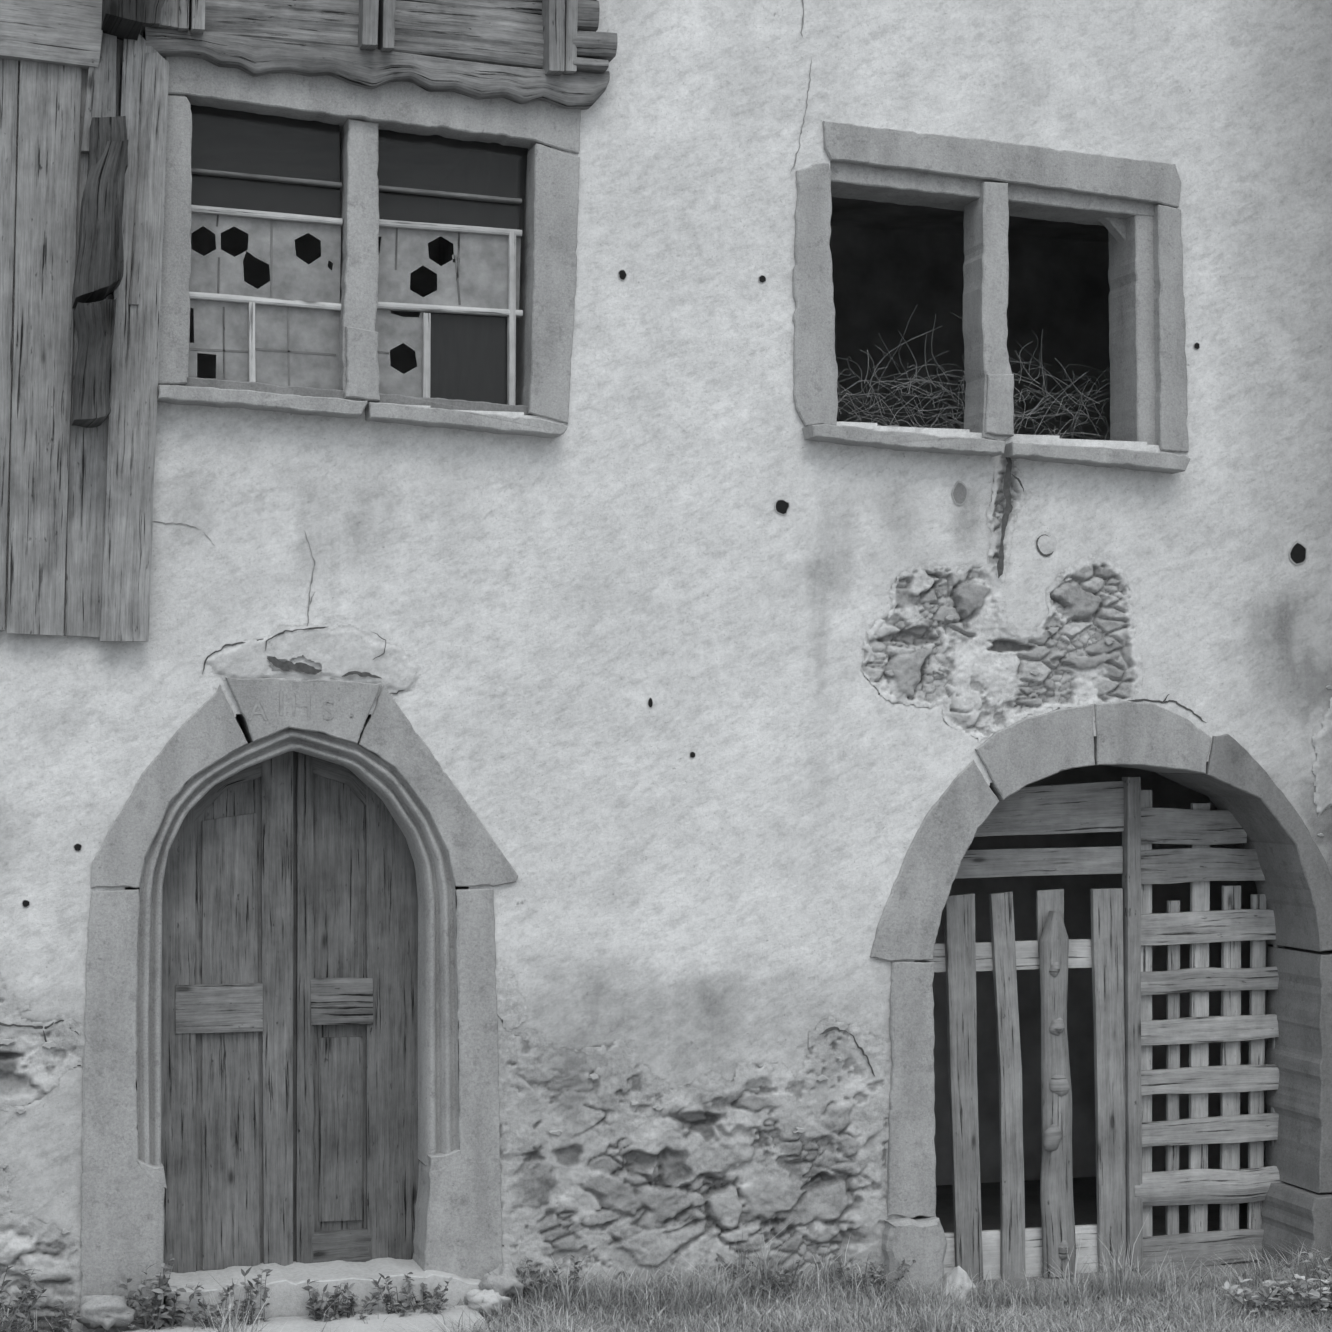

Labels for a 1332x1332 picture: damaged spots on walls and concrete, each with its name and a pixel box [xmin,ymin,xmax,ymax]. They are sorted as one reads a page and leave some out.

crack [790,0,812,173]
crack [305,533,315,626]
flaking render [202,623,421,695]
flaking render [860,455,1145,742]
flaking render [0,972,85,1115]
flaking render [495,962,895,1291]
flaking render [0,1162,82,1332]